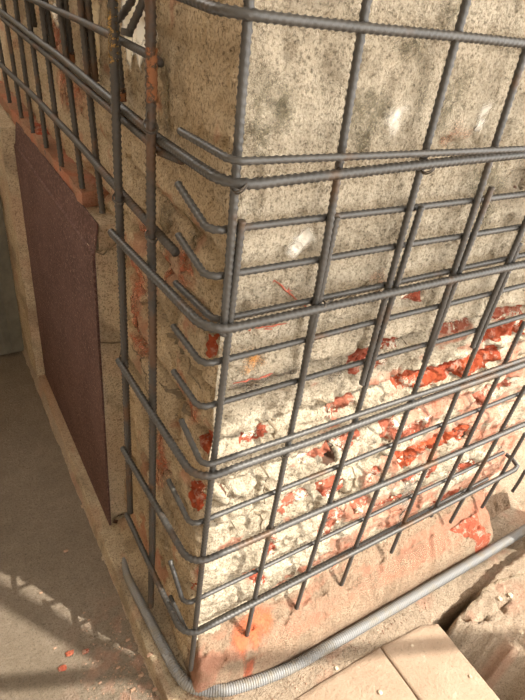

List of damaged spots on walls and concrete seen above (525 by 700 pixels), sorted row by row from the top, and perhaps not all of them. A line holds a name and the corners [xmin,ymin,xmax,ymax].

spalling [107,181,525,672]